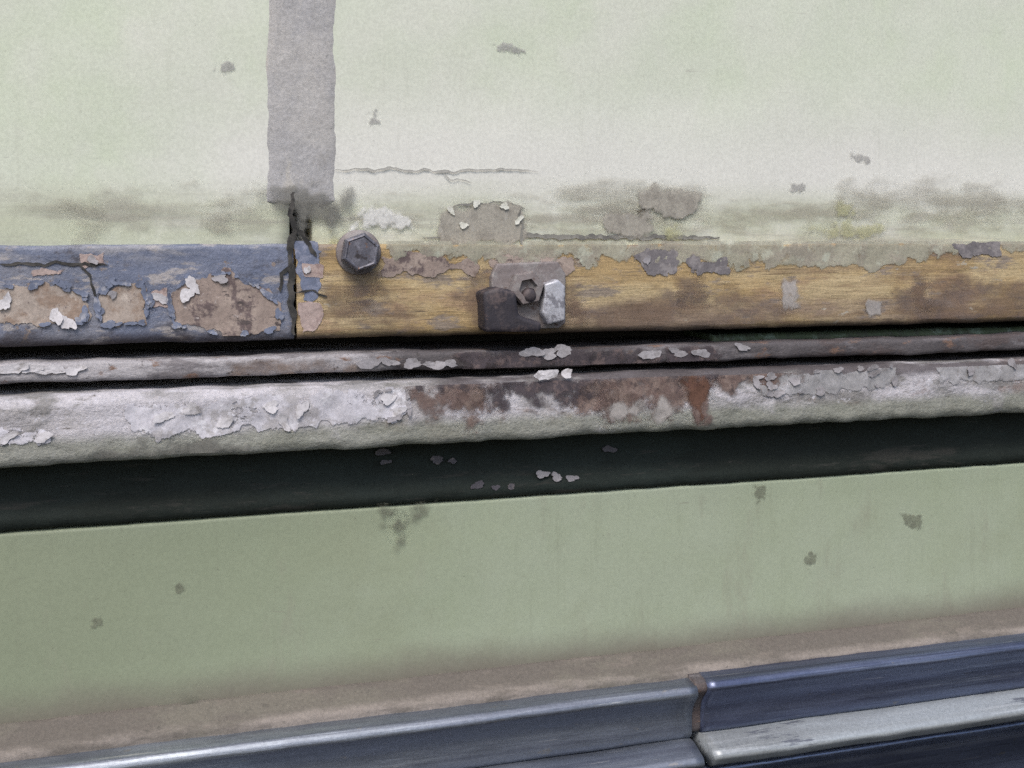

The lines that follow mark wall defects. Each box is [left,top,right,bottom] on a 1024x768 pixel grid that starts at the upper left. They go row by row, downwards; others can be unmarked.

leakage [271,186,353,241]
leakage [350,207,411,231]
crack [335,166,720,245]
peeling [381,183,1024,278]
crack [0,260,108,297]
peeling [0,267,284,336]
crack [279,192,327,335]
peeling [123,387,412,442]
corrosion [406,384,497,433]
peeling [519,344,572,380]
corrosion [572,373,803,425]
peeling [753,364,898,398]